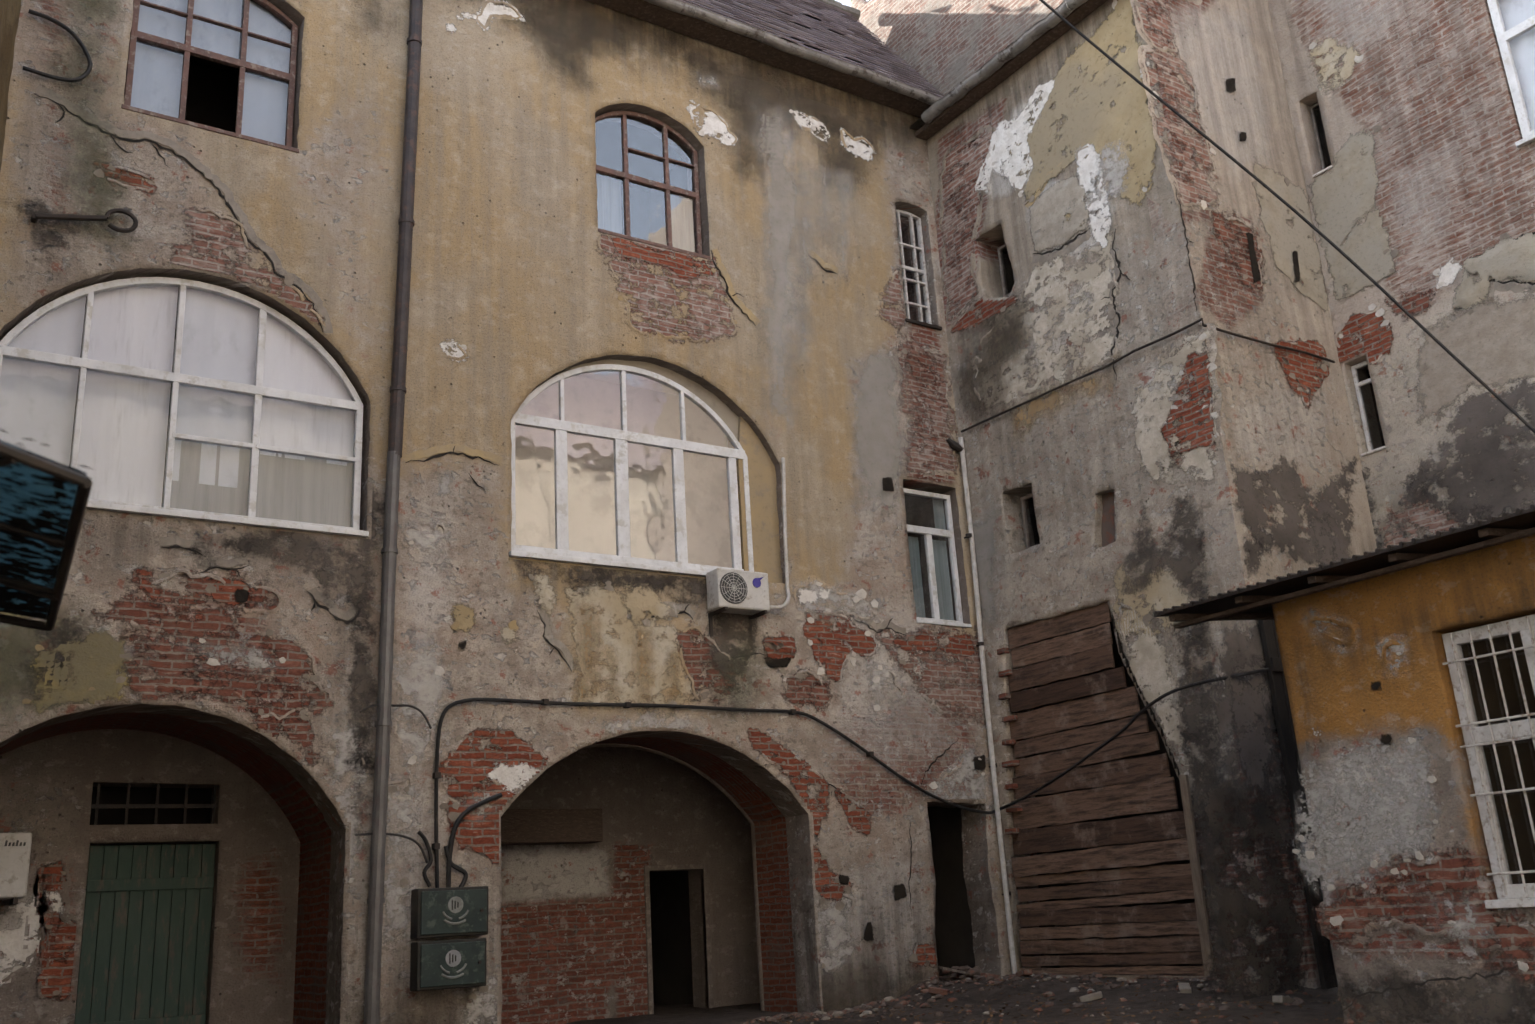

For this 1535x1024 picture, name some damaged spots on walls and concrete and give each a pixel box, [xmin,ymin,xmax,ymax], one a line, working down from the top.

crack [34,85,333,333]
flaking render [594,232,740,346]
peeling [789,109,877,163]
peeling [875,0,1266,491]
leakage [1230,455,1382,578]
flaking render [1272,257,1535,423]
leakage [1398,378,1535,524]
flaking render [91,564,371,883]
flaking render [382,640,550,944]
flaking render [747,728,874,977]
flaking render [759,578,986,727]
flaking render [1292,734,1535,989]